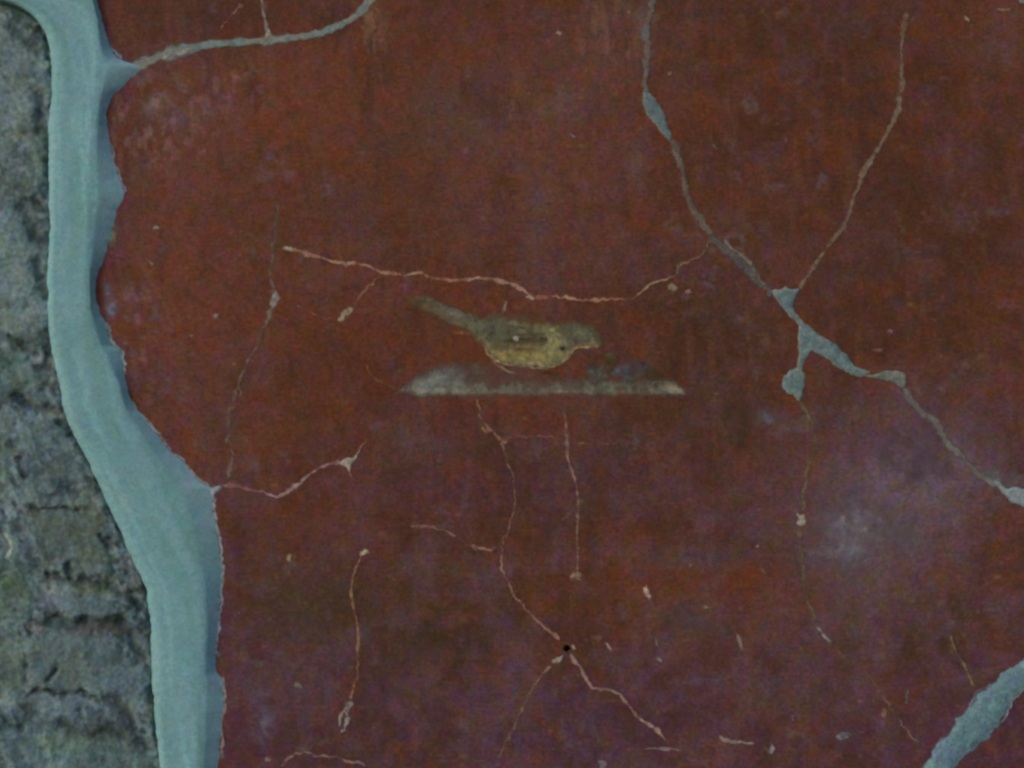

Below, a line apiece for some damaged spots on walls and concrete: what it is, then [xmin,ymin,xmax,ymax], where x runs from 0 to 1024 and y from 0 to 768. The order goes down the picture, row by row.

crack [133,0,376,71]
crack [209,0,1024,767]